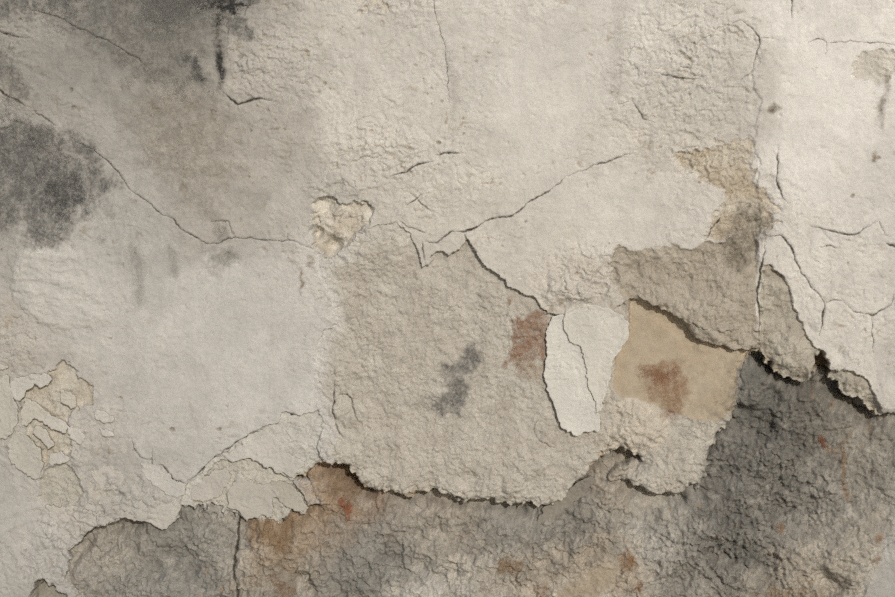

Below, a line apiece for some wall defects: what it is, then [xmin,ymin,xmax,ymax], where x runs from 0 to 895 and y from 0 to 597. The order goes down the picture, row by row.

damp [216,45,225,80]
damp [0,129,108,248]
crack [409,191,548,253]
crack [756,254,764,325]
crack [780,235,825,324]
spalling [0,133,895,597]
rust [505,311,547,364]